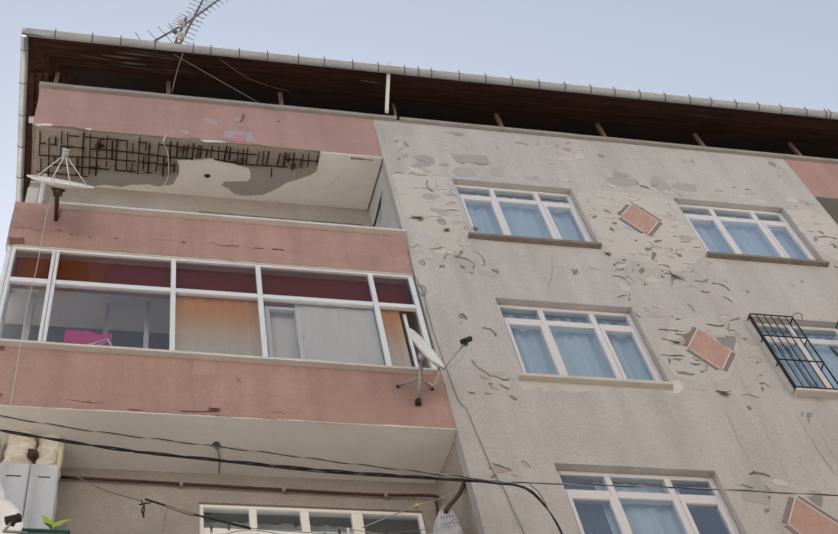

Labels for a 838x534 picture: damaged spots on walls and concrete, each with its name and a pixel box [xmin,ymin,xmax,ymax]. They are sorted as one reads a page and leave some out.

spalling [33,115,320,196]
peeling [392,140,490,274]
peeling [576,184,704,300]
peeling [787,205,838,268]
peeling [659,315,748,396]
peeling [741,471,772,513]